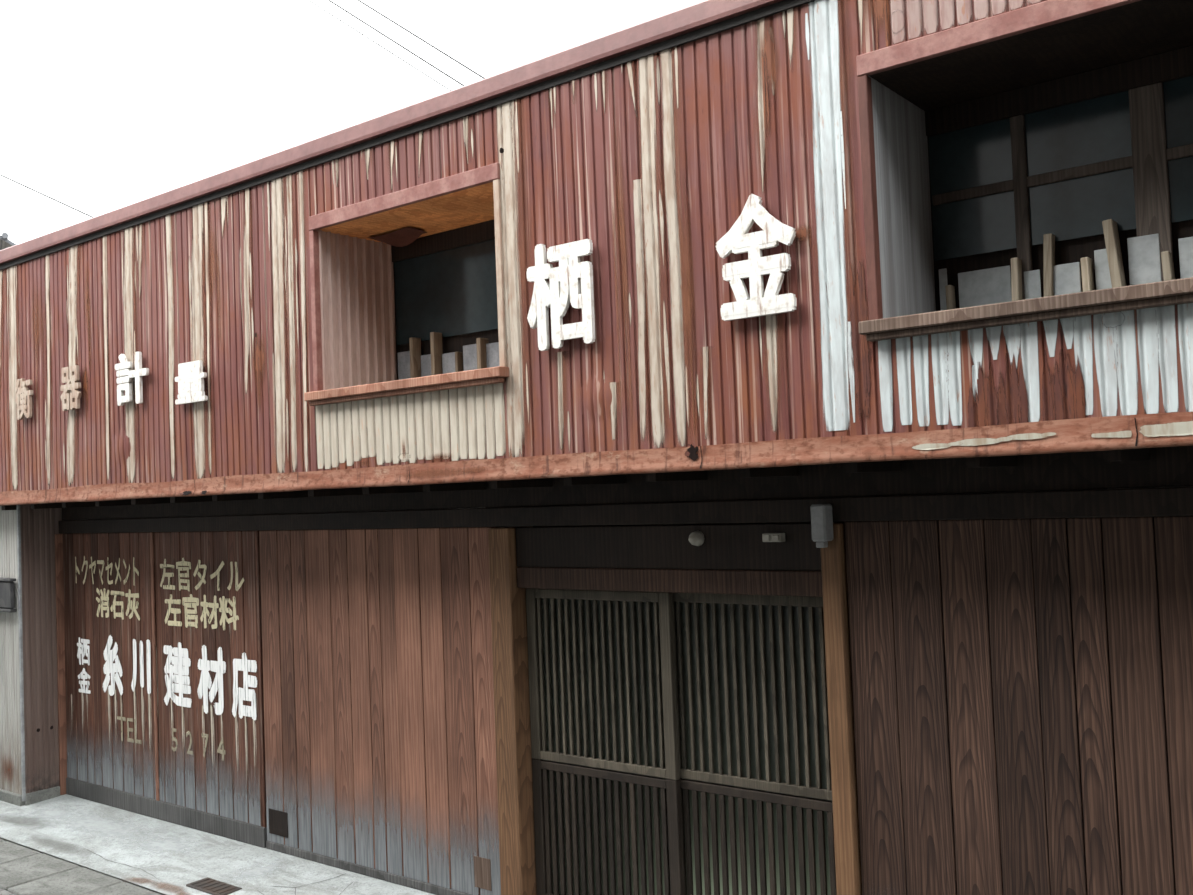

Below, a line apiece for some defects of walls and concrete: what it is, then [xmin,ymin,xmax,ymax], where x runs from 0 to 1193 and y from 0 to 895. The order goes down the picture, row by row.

rust [760,23,777,133]
rust [870,0,891,50]
peeling [890,0,1041,44]
rust [83,285,91,409]
rust [208,236,220,341]
rust [252,338,265,406]
rust [613,172,632,427]
rust [683,252,694,424]
rust [795,226,811,247]
rust [849,260,871,419]
peeling [878,303,1193,450]